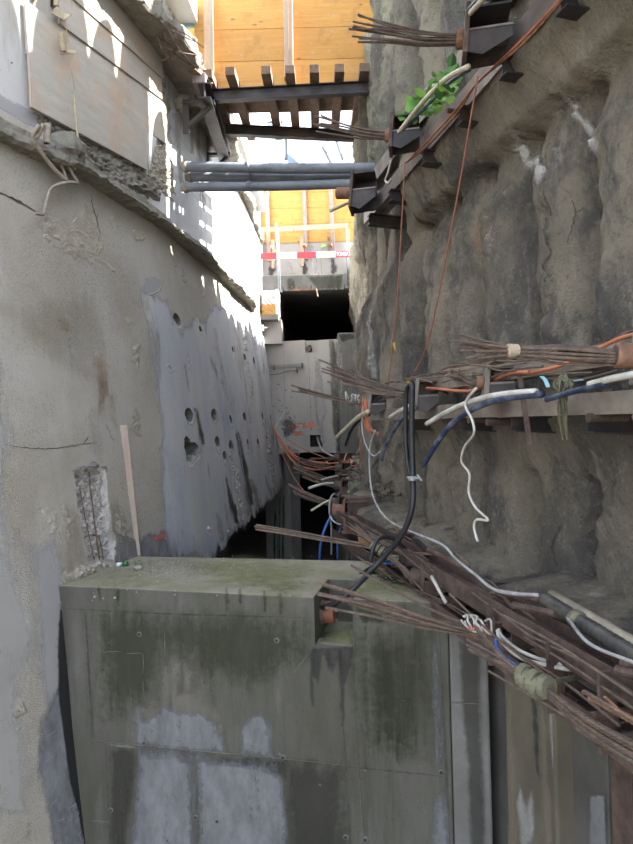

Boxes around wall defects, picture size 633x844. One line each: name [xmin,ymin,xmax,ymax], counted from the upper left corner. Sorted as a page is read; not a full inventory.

spalling [0,95,67,133]
spalling [80,21,204,202]
crack [8,429,115,449]
peeling [63,289,300,581]
leakage [226,478,238,524]
leakage [236,432,253,504]
leakage [310,648,351,712]
leakage [104,616,339,844]